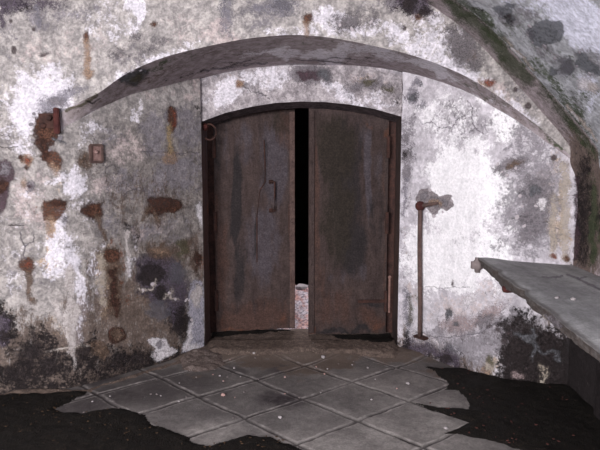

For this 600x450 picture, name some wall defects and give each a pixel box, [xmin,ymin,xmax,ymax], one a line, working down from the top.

rust [45,150,64,175]
rust [163,106,177,164]
rust [41,198,67,238]
rust [140,196,183,225]
leakage [548,155,599,267]
rust [17,257,37,305]
rust [79,201,124,318]
leakage [0,264,157,386]
rust [107,327,127,344]
leakage [481,314,571,385]